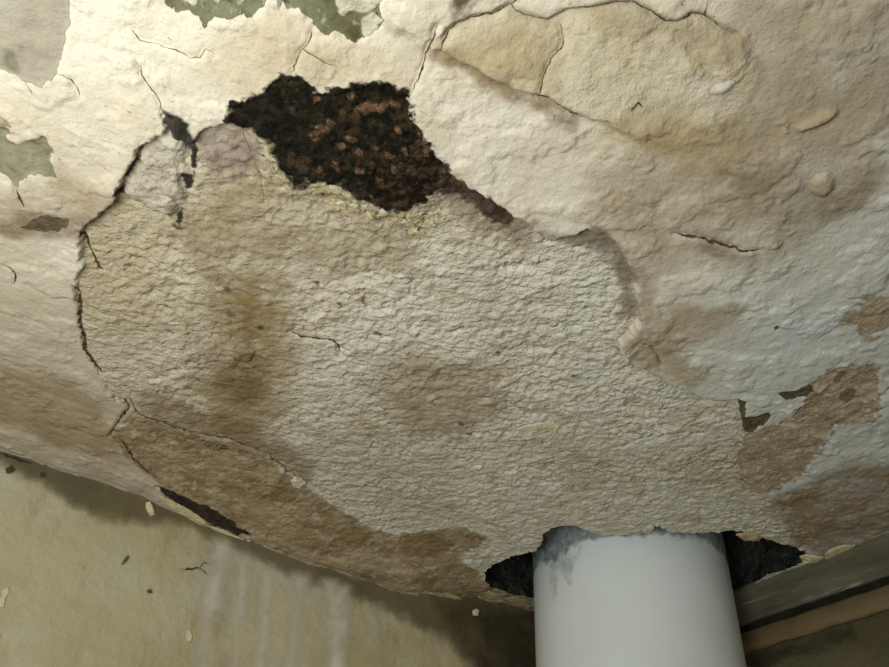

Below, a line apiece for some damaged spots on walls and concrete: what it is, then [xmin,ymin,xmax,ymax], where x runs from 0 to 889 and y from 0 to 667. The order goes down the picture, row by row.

peeling [0,118,56,187]
peeling [0,0,71,88]
crack [112,145,143,197]
crack [132,30,209,225]
peeling [164,0,384,42]
crack [412,0,734,118]
water stain [700,0,879,220]
crack [75,287,102,373]
spalling [76,123,889,616]
crack [110,396,295,542]
water stain [0,451,536,667]
water stain [776,468,889,561]